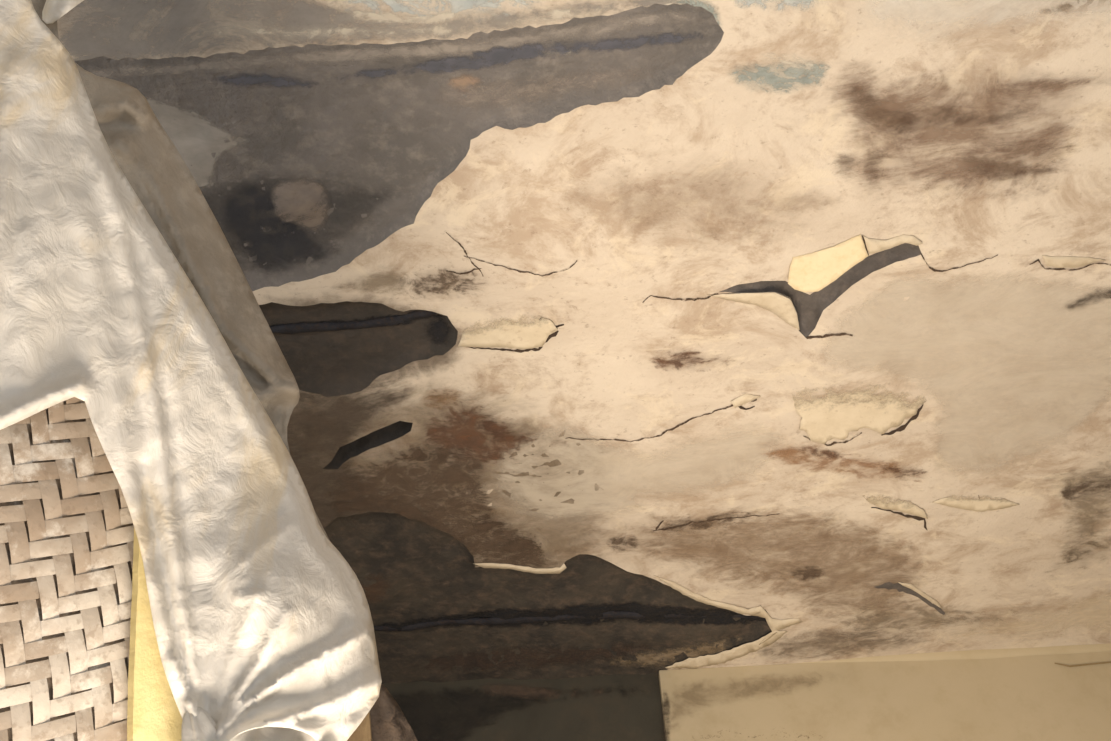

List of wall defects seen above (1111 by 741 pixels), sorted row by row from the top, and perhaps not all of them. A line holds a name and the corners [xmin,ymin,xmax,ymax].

spalling [74,3,724,291]
water stain [843,82,1067,187]
crack [446,232,577,277]
peeling [673,234,998,339]
spalling [259,301,564,397]
spalling [323,421,413,469]
corrosion [426,390,537,462]
crack [565,394,761,442]
corrosion [770,449,924,476]
peeling [793,390,923,446]
spalling [324,511,802,683]
crack [875,582,945,615]